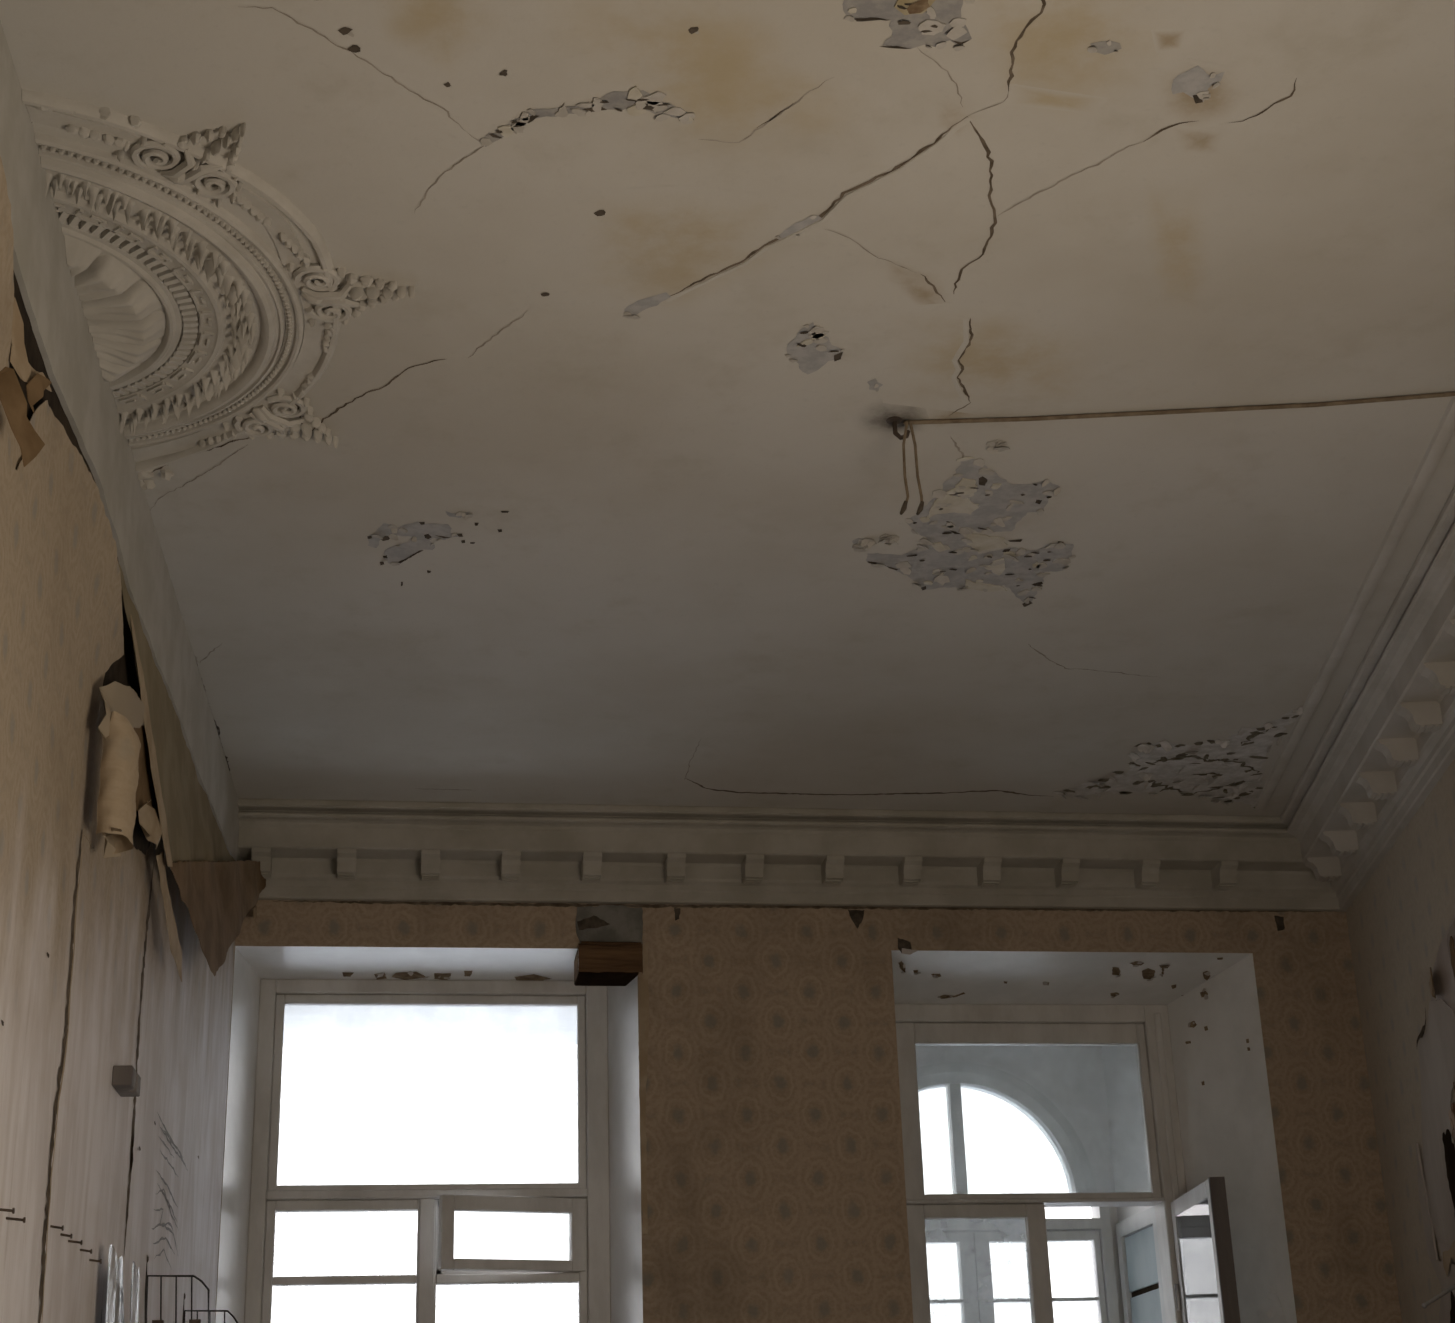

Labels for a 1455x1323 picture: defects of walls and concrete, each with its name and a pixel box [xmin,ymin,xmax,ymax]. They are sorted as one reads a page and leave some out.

peeling [843,0,975,51]
peeling [480,86,695,147]
crack [1231,78,1297,123]
crack [665,0,1195,458]
peeling [0,297,52,467]
peeling [785,322,845,374]
peeling [367,511,478,586]
peeling [852,440,1076,607]
peeling [118,562,266,982]
peeling [1054,707,1303,808]
peeling [1110,957,1223,1000]
spalling [1416,915,1455,1323]